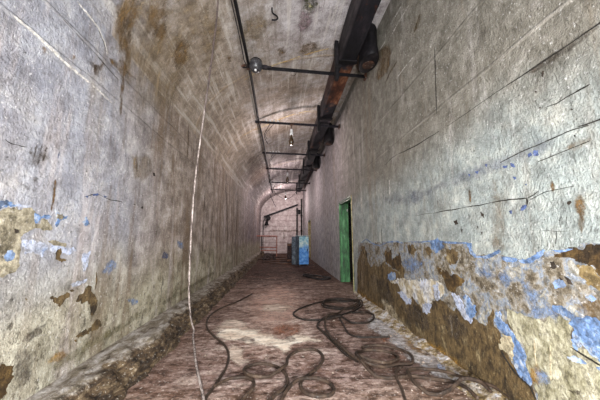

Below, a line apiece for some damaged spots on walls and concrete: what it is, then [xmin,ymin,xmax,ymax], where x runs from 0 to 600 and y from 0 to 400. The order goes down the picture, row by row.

water stain [117,0,220,106]
crack [385,22,600,165]
spalling [0,351,30,399]
peeling [0,200,116,342]
peeling [357,238,600,400]
crack [417,186,573,216]